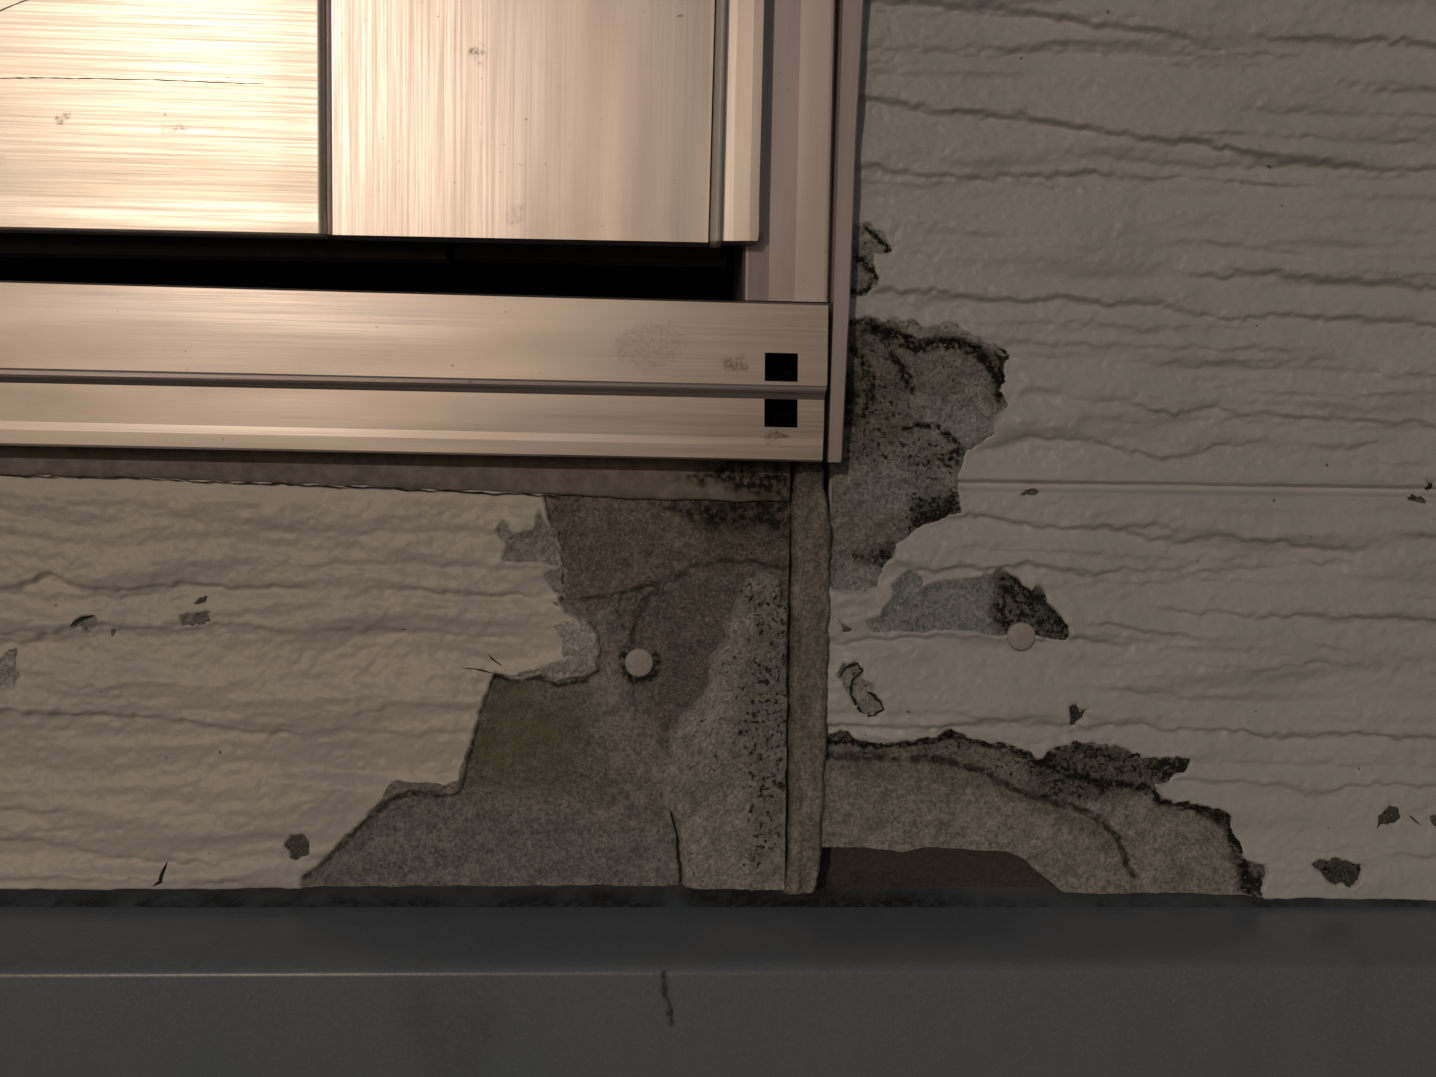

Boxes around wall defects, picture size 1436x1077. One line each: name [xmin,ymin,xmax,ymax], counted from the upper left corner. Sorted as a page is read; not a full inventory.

spalling [850,223,892,299]
spalling [829,316,1069,640]
peeling [0,647,20,689]
peeling [285,461,791,891]
peeling [838,662,884,718]
spalling [821,704,1265,898]
peeling [1377,805,1400,828]
peeling [1312,857,1361,887]